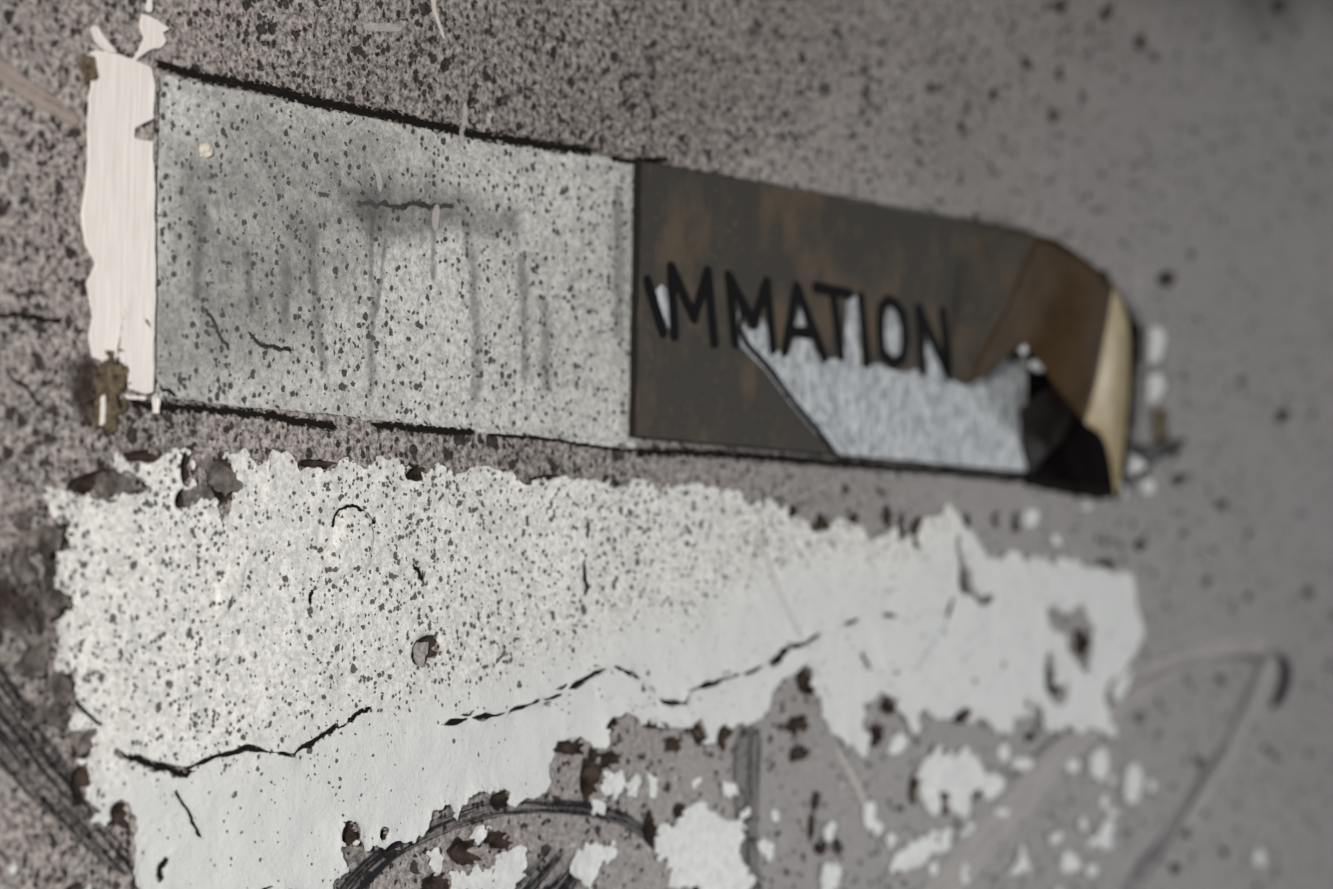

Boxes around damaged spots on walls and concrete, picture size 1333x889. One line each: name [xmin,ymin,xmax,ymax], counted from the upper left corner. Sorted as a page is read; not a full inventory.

crack [0,310,61,324]
peeling [1147,327,1166,402]
peeling [8,445,1155,889]
crack [447,597,955,726]
crack [75,698,370,838]